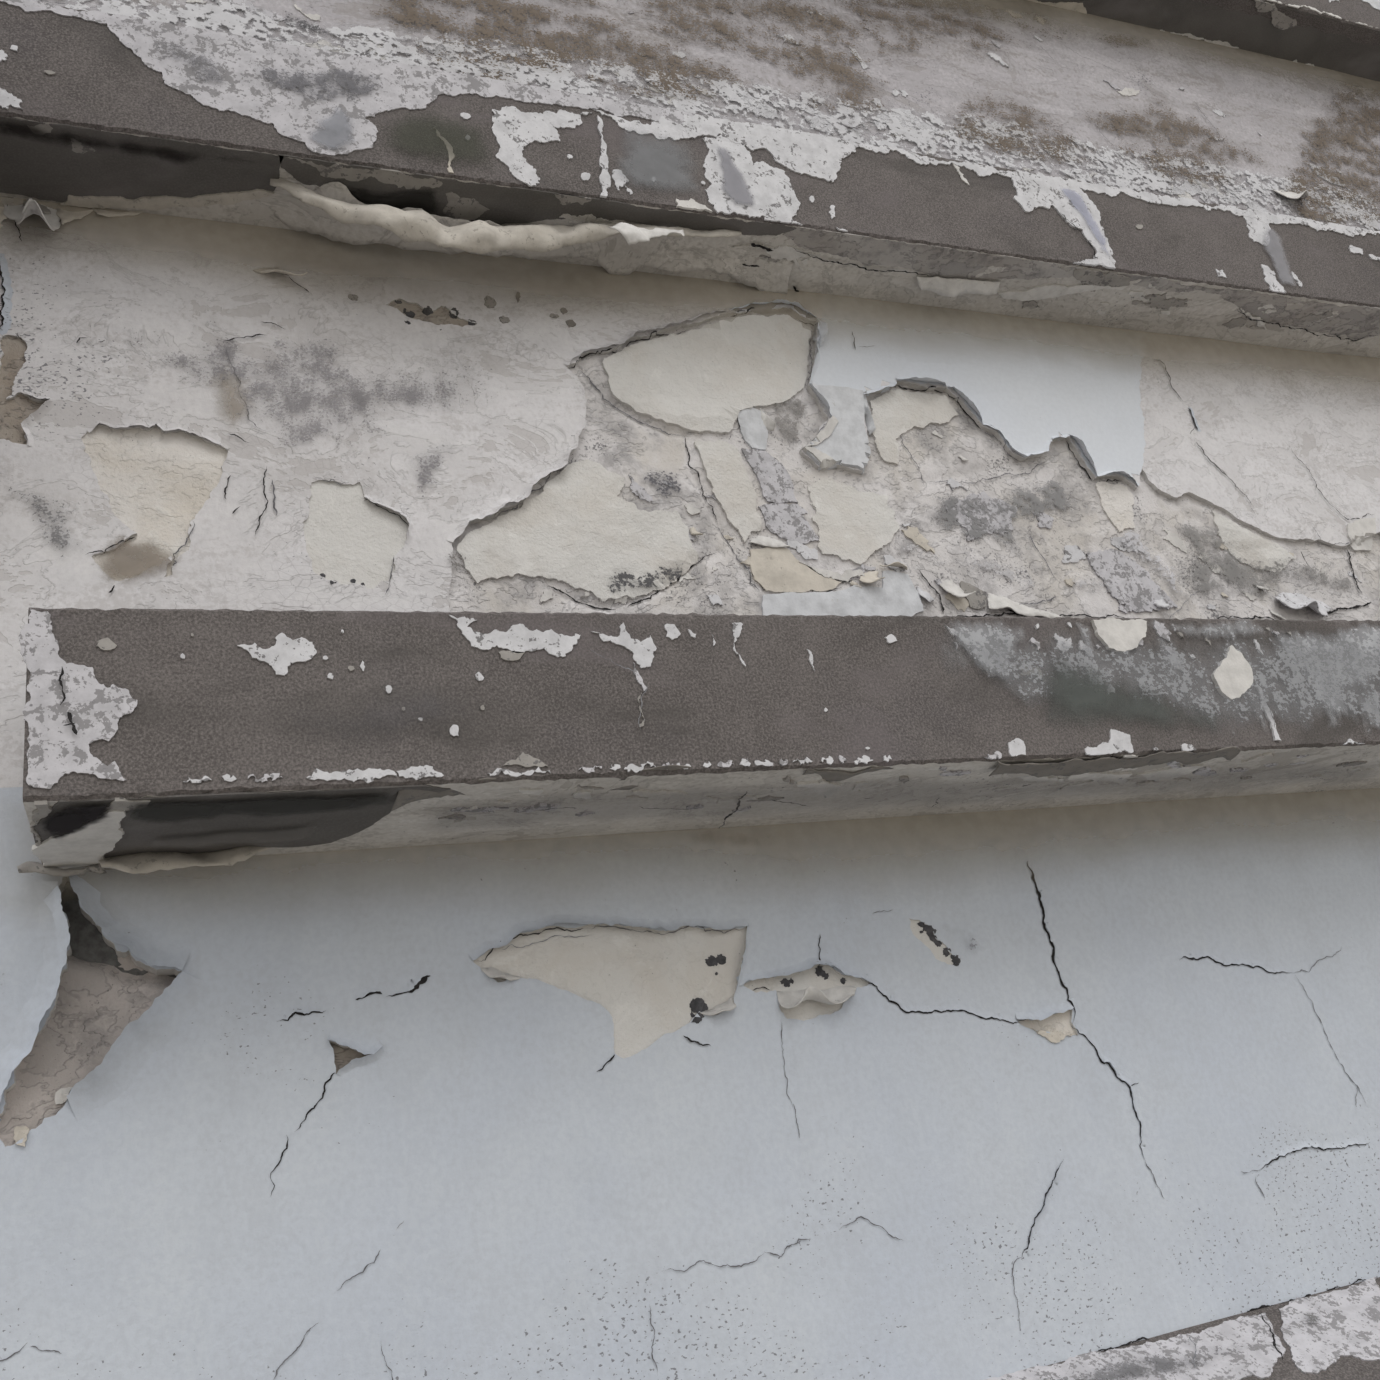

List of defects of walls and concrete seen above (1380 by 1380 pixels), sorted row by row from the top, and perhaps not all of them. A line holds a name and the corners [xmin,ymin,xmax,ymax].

leakage [64,0,1380,231]
peeling [0,0,1380,791]
peeling [573,747,909,813]
crack [270,1073,334,1195]
peeling [468,914,873,1058]
crack [863,973,1032,1024]
crack [1027,861,1164,1198]
crack [1175,950,1369,1198]
crack [1012,1159,1068,1323]
crack [0,1343,61,1361]
peeling [984,1277,1380,1380]